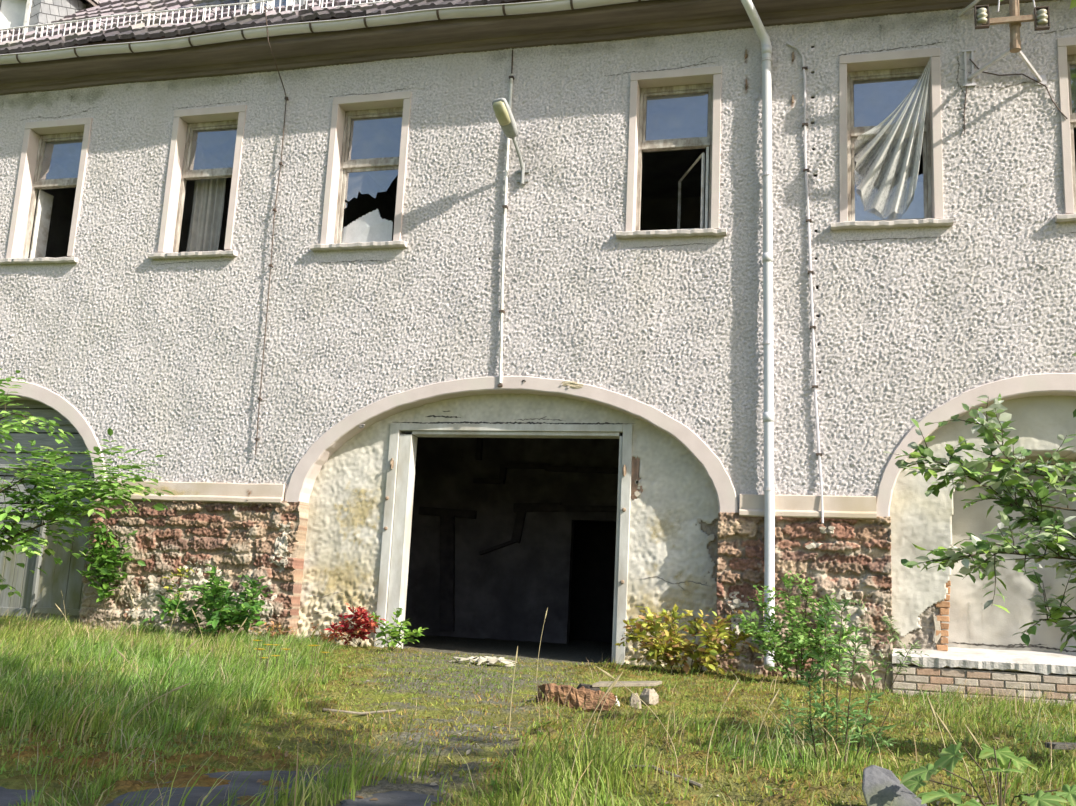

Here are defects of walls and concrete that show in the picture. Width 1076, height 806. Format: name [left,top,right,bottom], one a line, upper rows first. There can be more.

crack [831,41,1035,138]
peeling [270,522,292,573]
flaking render [696,518,718,584]
peeling [123,561,280,633]
crack [637,576,712,594]
peeling [724,592,754,653]